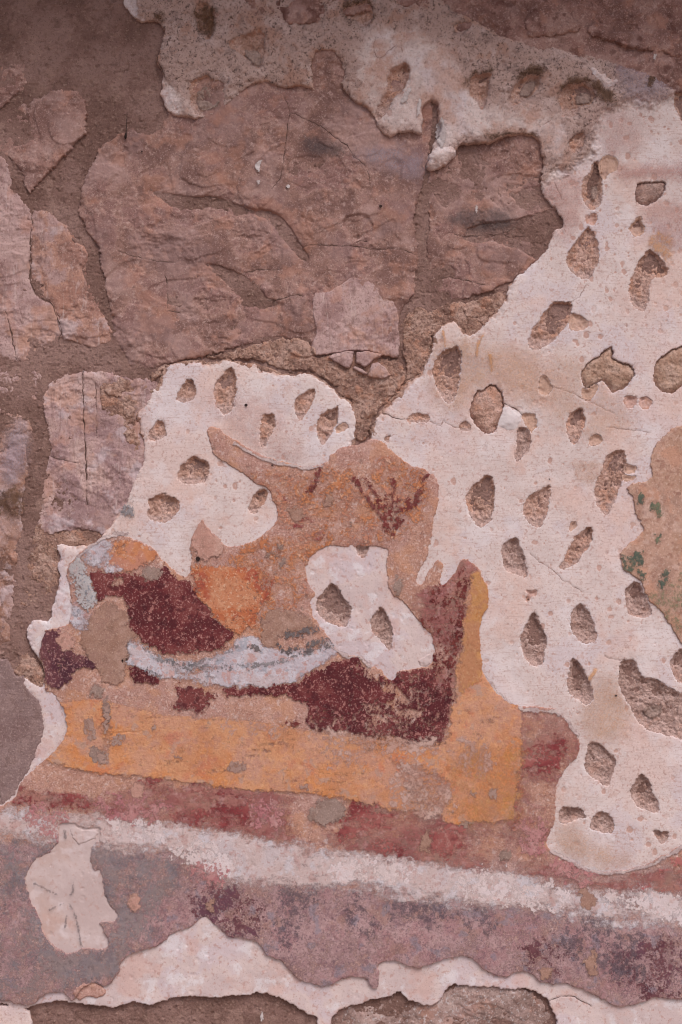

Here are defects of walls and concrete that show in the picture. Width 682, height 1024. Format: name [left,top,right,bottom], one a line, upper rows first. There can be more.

hole [375,62,410,120]
hole [469,73,492,110]
hole [528,302,588,350]
spalling [100,283,512,451]
spalling [538,375,553,395]
crack [51,373,97,503]
hole [465,475,495,528]
hole [520,613,547,667]
peeling [0,544,77,806]
spalling [618,649,682,740]
spalling [584,742,616,786]
peeling [33,917,682,1024]